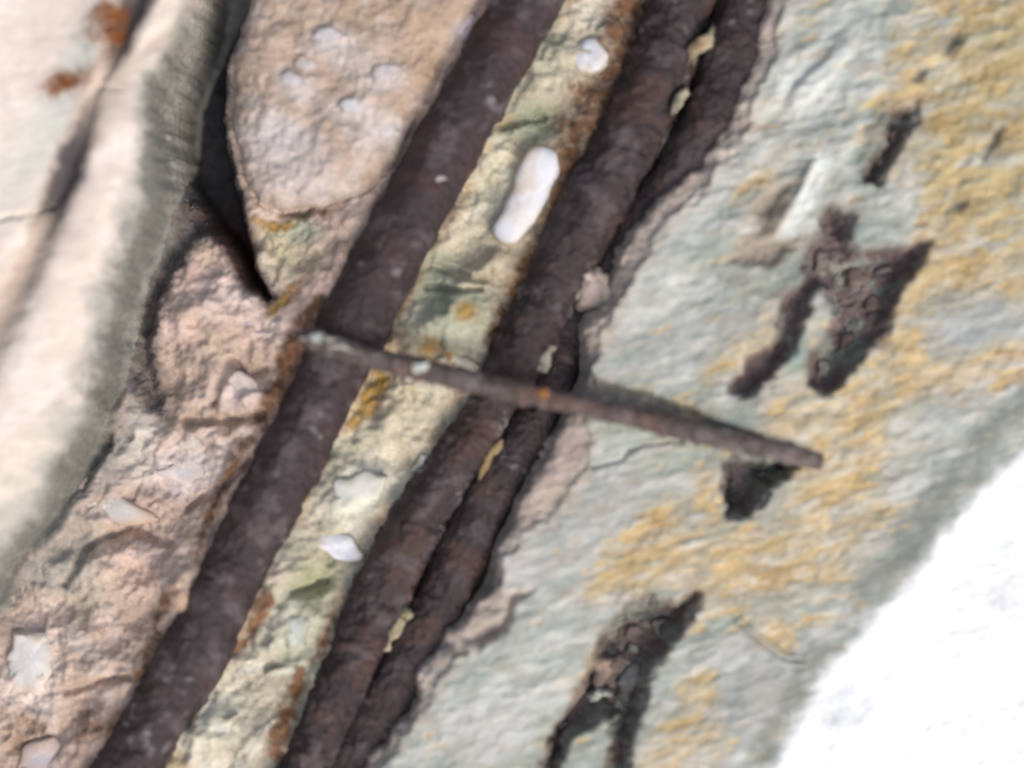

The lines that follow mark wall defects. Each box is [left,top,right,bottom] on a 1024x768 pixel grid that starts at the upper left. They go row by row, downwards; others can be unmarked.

rust [87,2,126,42]
rust [48,74,80,95]